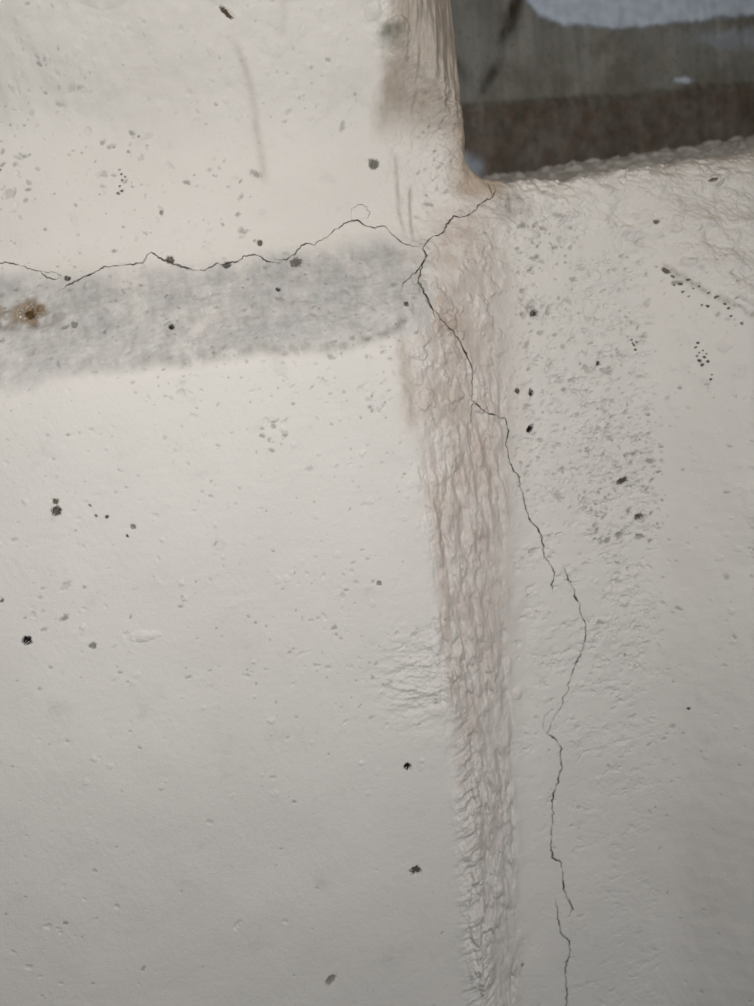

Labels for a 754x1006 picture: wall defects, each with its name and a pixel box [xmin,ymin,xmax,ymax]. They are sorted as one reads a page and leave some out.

crack [0,184,586,686]
crack [550,834,573,963]